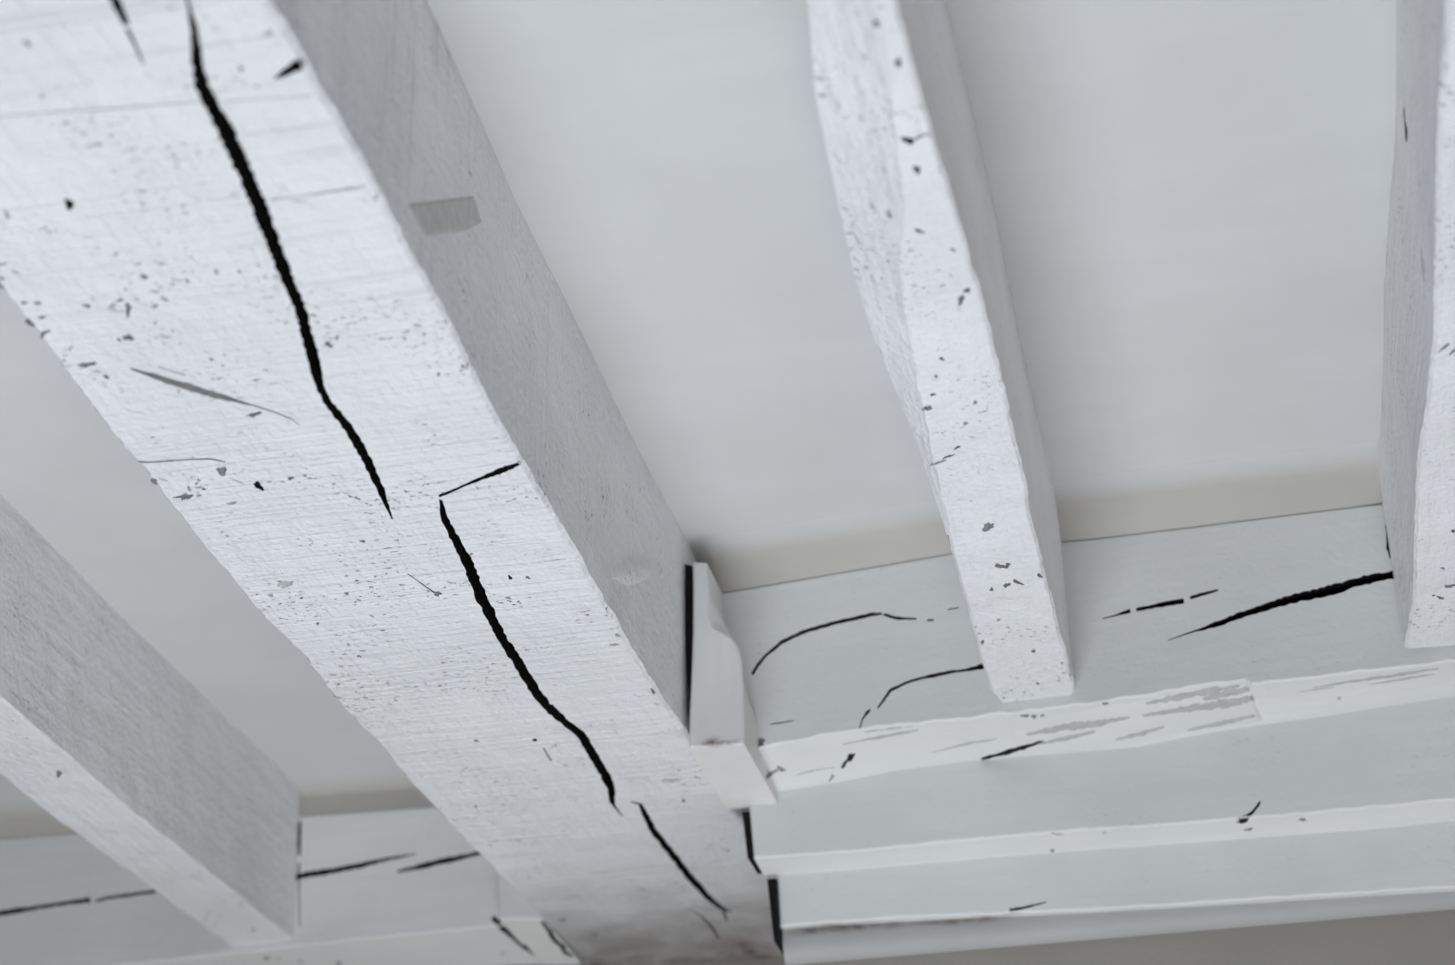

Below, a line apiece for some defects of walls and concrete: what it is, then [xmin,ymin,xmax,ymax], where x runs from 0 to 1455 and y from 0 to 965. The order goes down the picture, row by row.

crack [110,0,144,65]
crack [186,0,393,519]
crack [1102,570,1394,640]
crack [751,607,959,675]
crack [408,461,732,941]
crack [859,664,984,728]
crack [296,852,481,880]
crack [0,890,169,916]